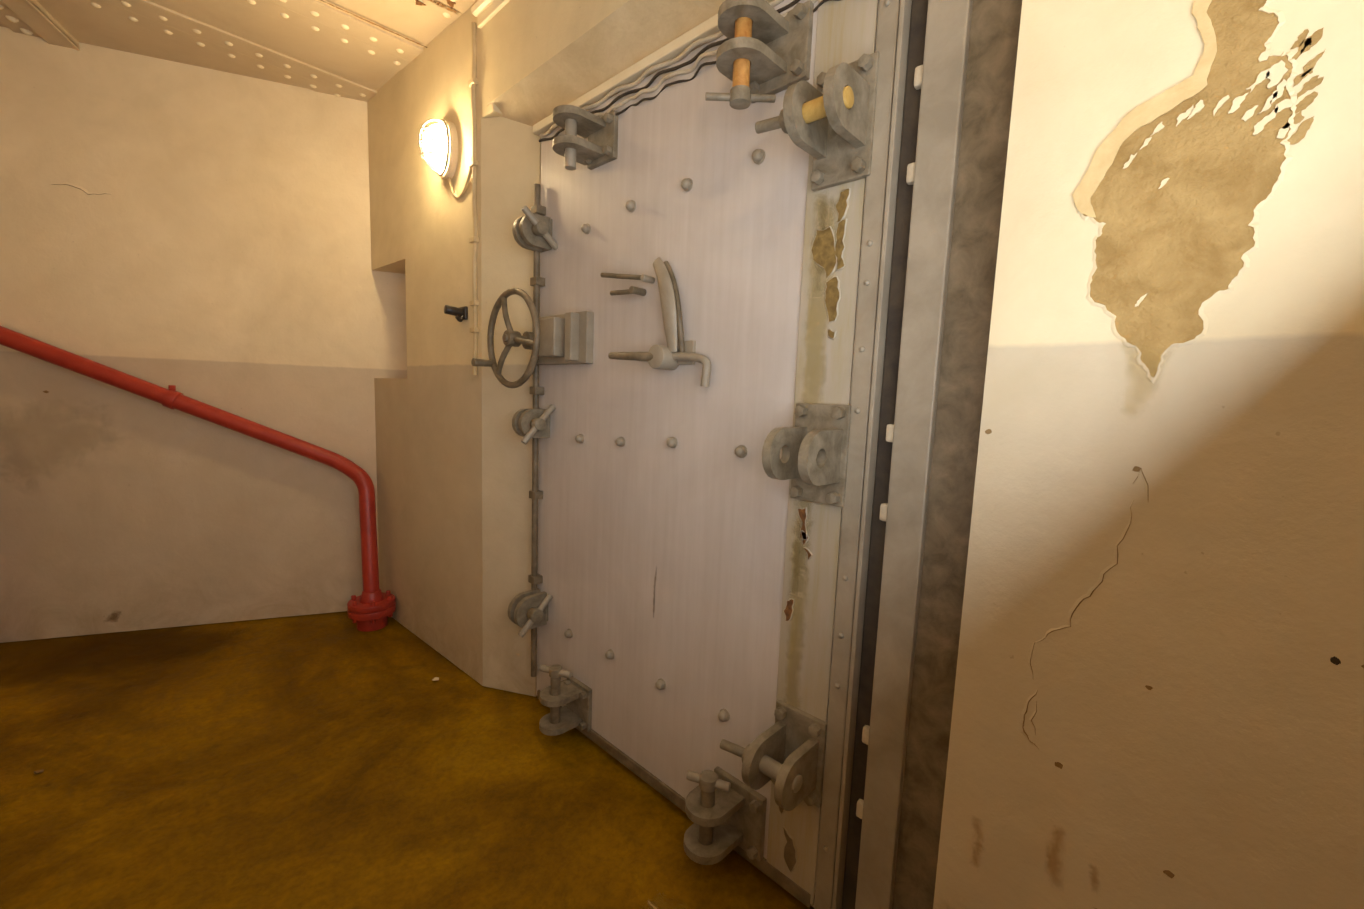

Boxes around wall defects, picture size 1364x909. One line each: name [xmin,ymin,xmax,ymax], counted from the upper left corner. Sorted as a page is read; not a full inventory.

peeling [1072,0,1325,384]
crack [1020,469,1148,750]